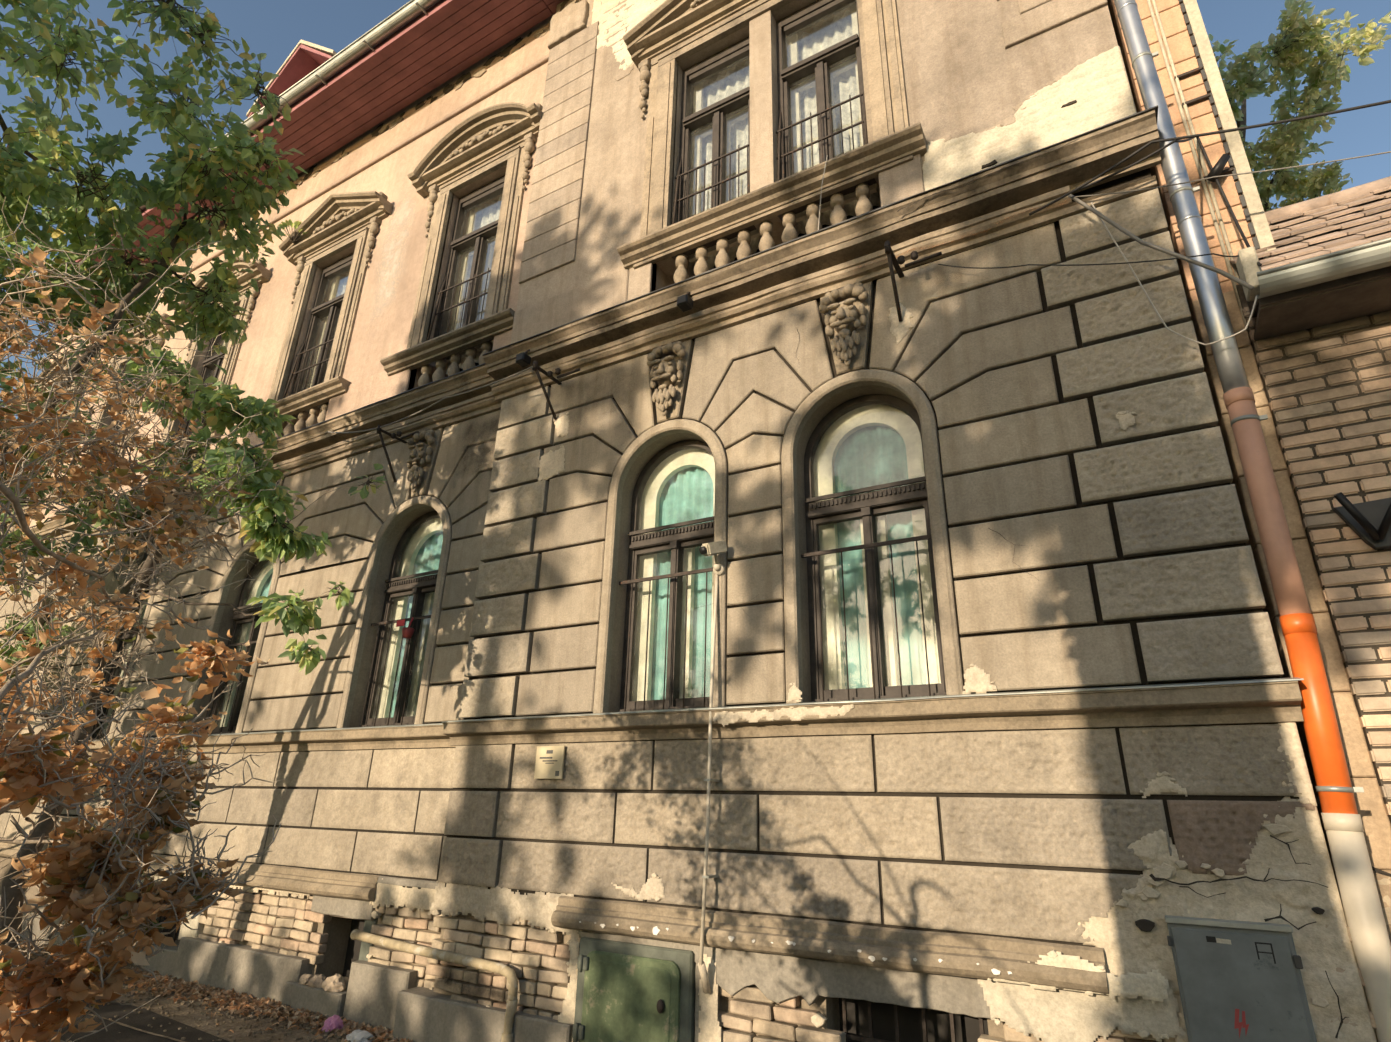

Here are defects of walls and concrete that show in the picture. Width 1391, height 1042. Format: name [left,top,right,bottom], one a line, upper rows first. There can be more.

flaking render [568,0,666,81]
flaking render [922,46,1137,191]
flaking render [977,722,1377,1042]
crack [1149,835,1328,930]
crack [1372,867,1391,876]
flaking render [366,878,581,1042]
flaking render [698,954,846,1042]